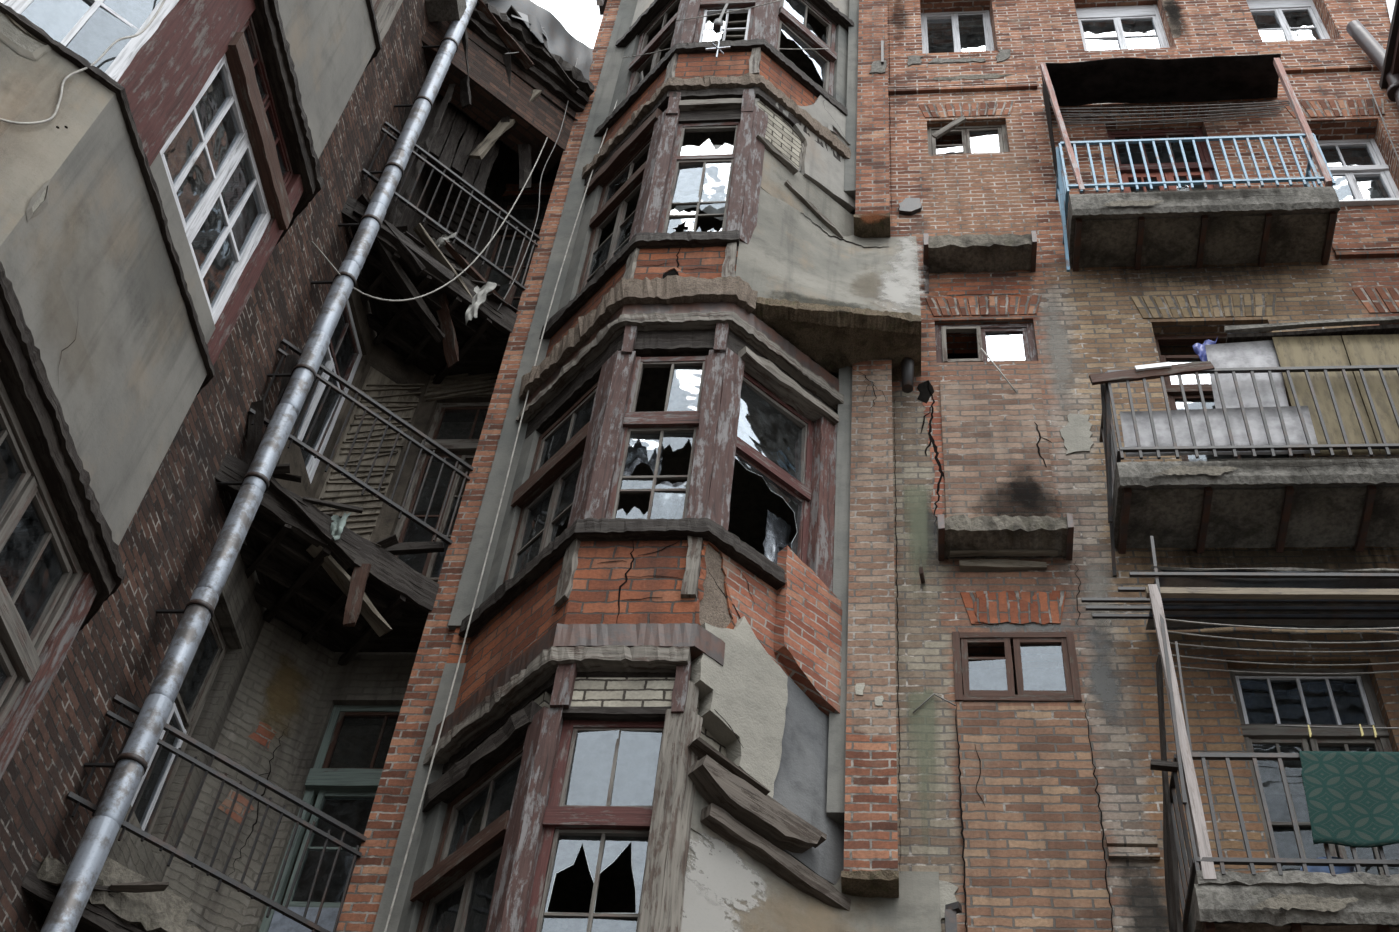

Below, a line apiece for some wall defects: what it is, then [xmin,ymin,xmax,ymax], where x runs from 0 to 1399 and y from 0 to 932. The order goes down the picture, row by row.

peeling [879,238,924,310]
crack [1034,422,1052,467]
crack [601,540,765,648]
spalling [695,541,735,629]
crack [853,369,945,868]